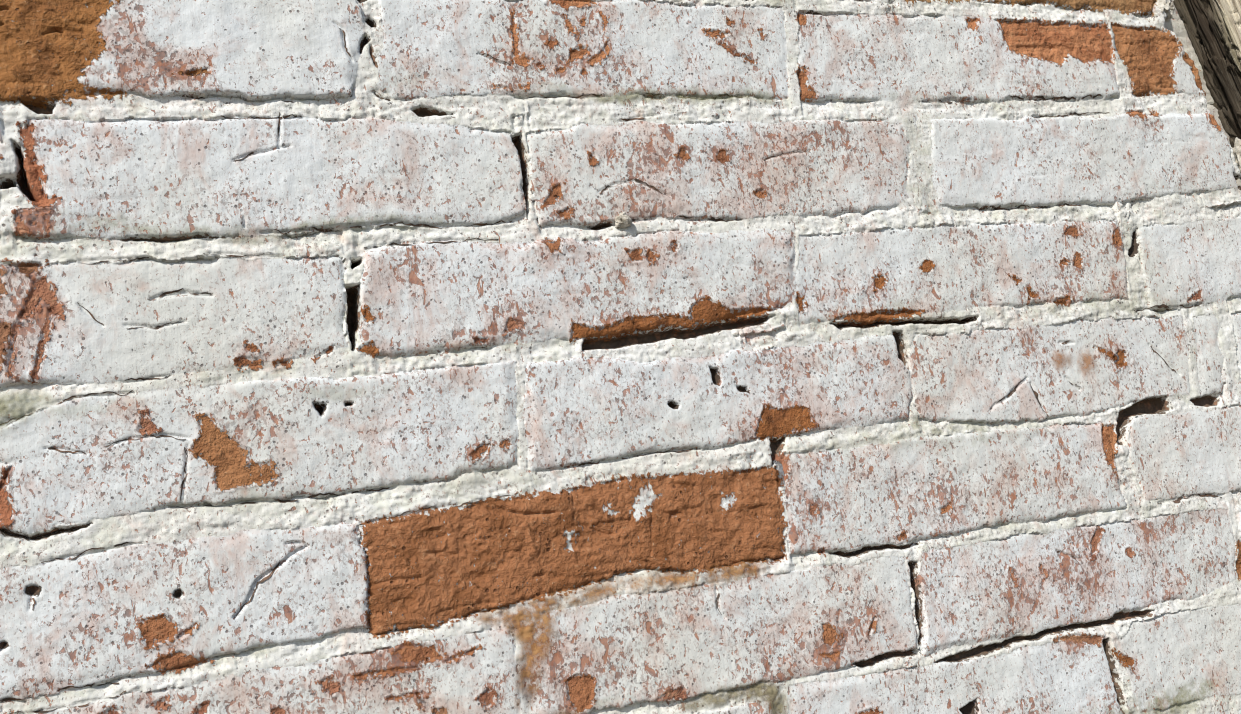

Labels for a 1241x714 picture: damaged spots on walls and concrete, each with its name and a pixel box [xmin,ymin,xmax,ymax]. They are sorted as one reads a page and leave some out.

spalling [905,0,1206,122]
spalling [0,0,133,240]
peeling [871,273,888,291]
peeling [0,257,65,384]
peeling [568,295,773,345]
peeling [828,306,925,327]
peeling [186,409,280,491]
spalling [314,402,819,695]
peeling [190,699,214,714]
peeling [384,691,449,714]
peeling [473,684,498,713]
peeling [560,673,598,713]